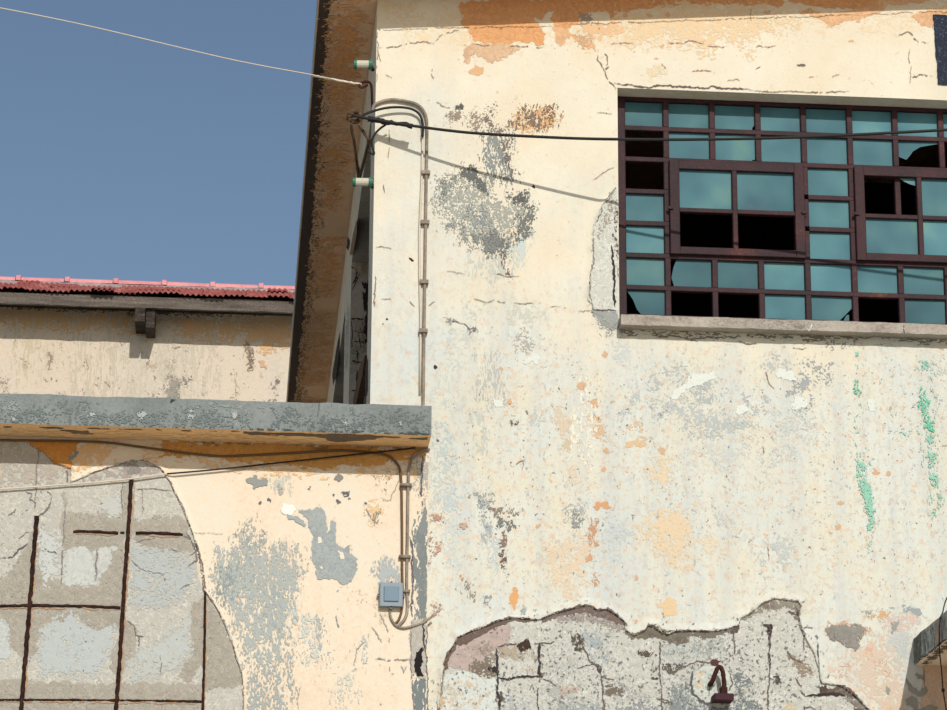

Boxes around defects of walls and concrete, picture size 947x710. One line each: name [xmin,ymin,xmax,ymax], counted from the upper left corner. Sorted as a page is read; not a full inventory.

peeling [459,0,947,76]
peeling [443,101,564,138]
spalling [587,188,619,331]
peeling [240,316,293,369]
rust [0,483,207,710]
crack [2,441,244,707]
spalling [0,439,425,710]
peeling [411,497,947,710]
crack [651,627,736,710]
crack [763,610,869,710]